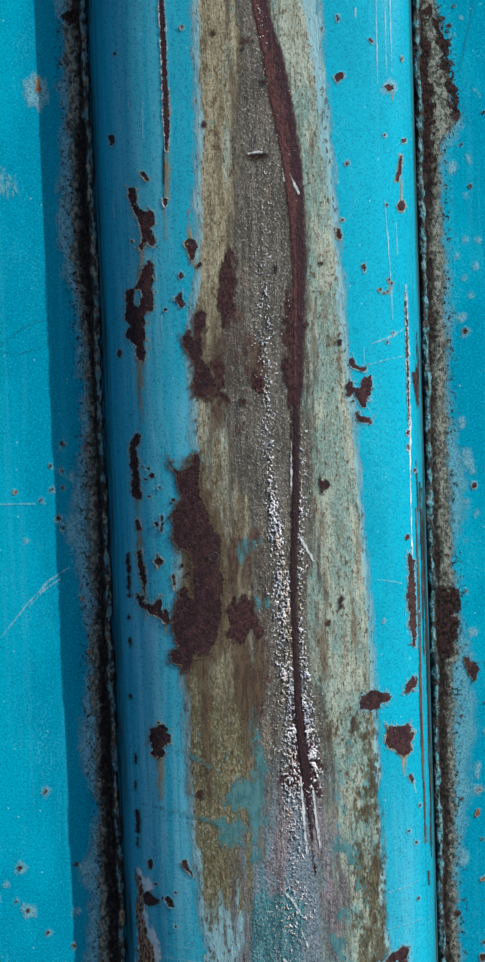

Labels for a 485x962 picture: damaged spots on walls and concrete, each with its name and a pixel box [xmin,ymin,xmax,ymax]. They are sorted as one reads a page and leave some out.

rust [57,0,120,962]
rust [123,151,169,412]
peeling [153,547,185,600]
rust [135,450,272,800]
rust [179,247,265,433]
peeling [163,0,392,962]
rust [240,0,326,876]
rust [345,356,375,424]
rust [351,688,393,734]
rust [384,0,479,962]
rust [133,866,163,962]
rust [379,944,411,962]